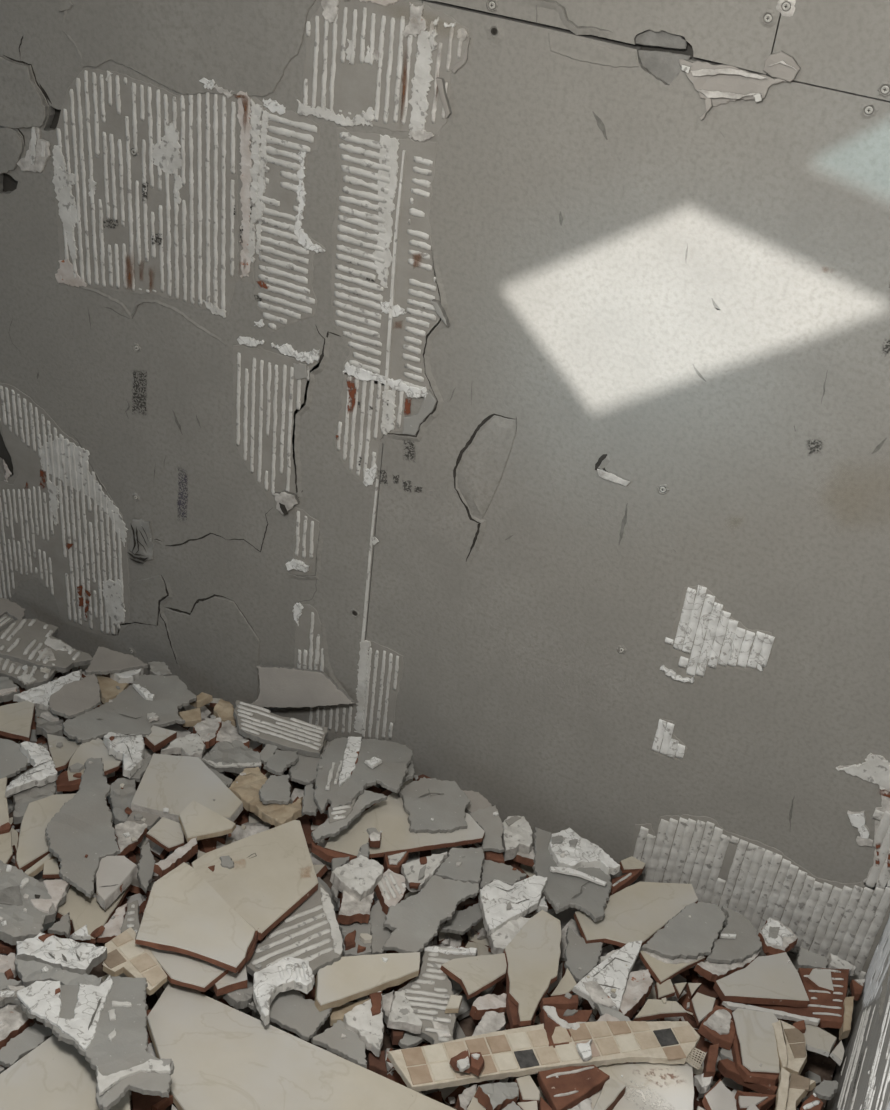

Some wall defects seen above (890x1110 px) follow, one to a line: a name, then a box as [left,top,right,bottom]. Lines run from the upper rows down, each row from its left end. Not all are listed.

peeling [63,0,316,97]
crack [292,324,339,498]
crack [154,509,271,552]
crack [453,414,517,565]
crack [107,574,254,669]
peeling [847,811,874,847]